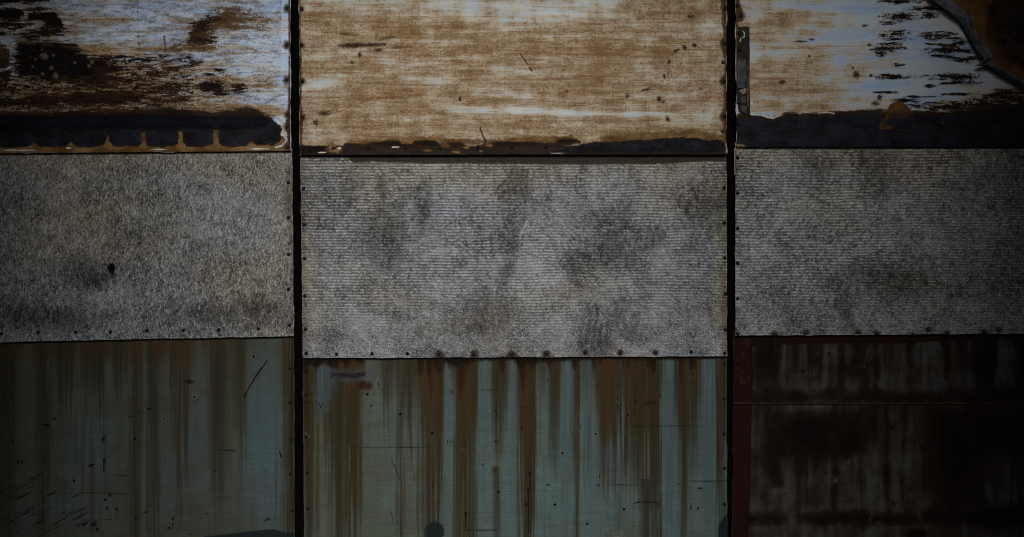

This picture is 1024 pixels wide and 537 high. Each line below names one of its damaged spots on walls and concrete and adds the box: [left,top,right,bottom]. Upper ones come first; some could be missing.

peeling [0,0,288,153]
corrosion [282,0,331,155]
corrosion [337,33,405,64]
peeling [318,0,1024,154]
corrosion [0,342,23,537]
corrosion [39,338,245,537]
corrosion [279,336,727,537]
corrosion [743,327,1024,528]